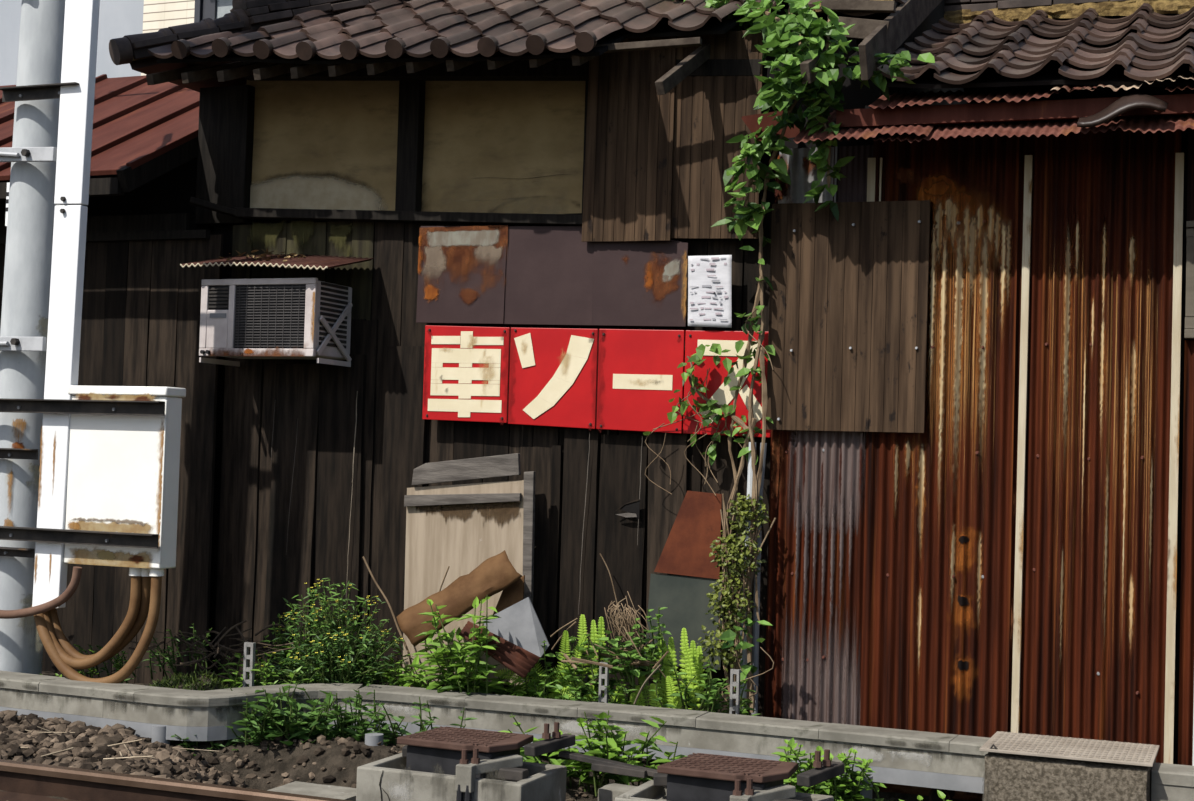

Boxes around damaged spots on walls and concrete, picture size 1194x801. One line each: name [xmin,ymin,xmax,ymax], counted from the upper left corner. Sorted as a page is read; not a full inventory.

damp [248,174,381,256]
corrosion [644,253,687,317]
corrosion [77,393,154,401]
corrosion [30,428,56,508]
corrosion [68,423,164,568]
corrosion [955,602,971,626]
corrosion [953,664,971,698]